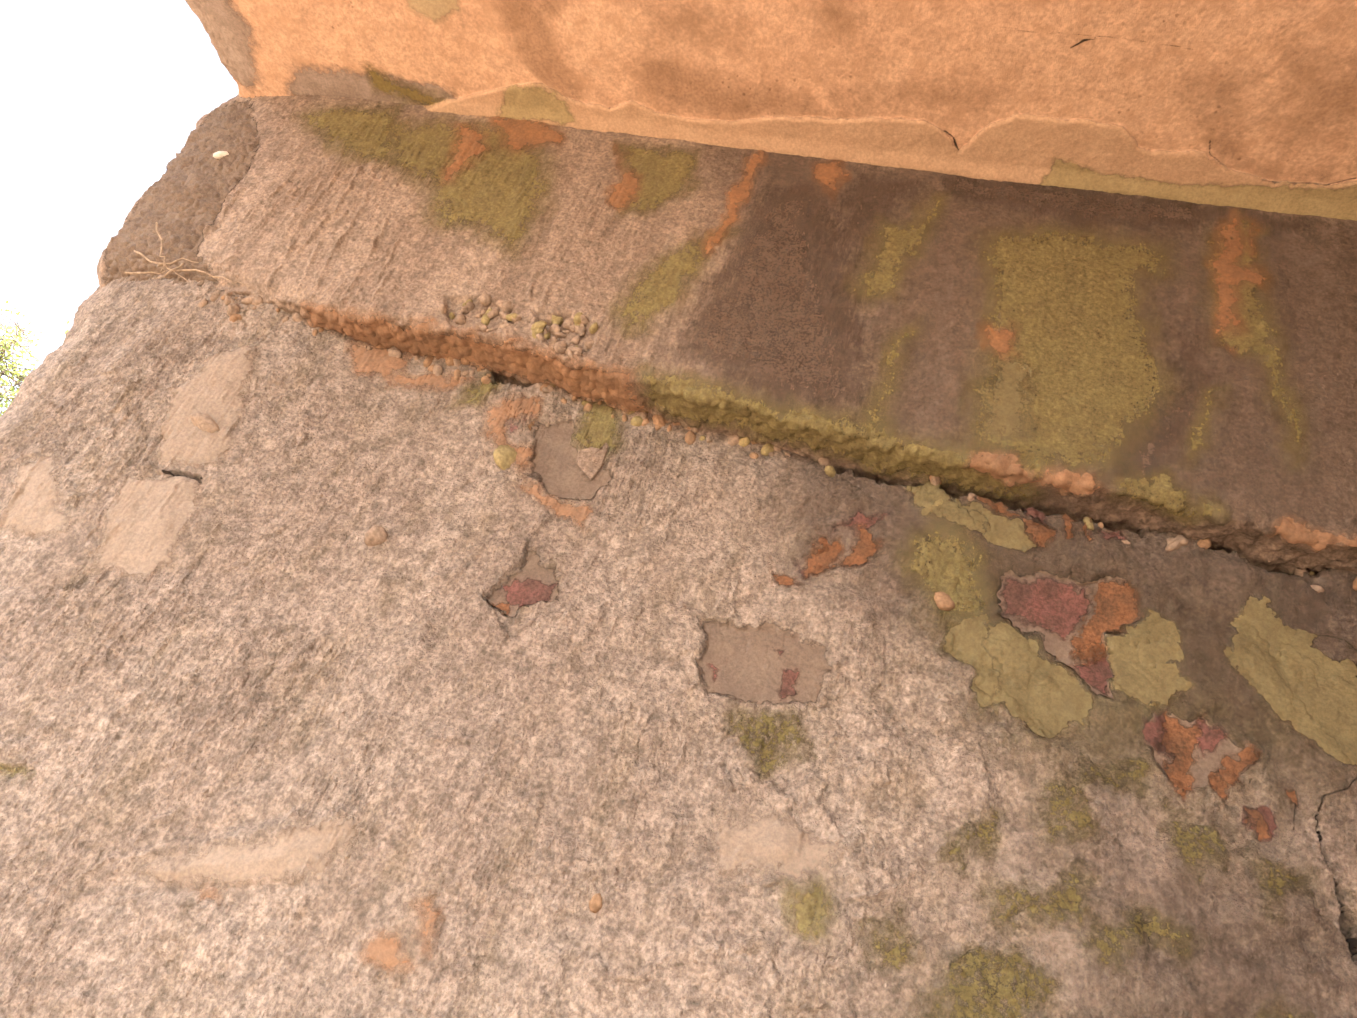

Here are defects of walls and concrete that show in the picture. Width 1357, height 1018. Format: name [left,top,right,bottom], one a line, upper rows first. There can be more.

rust [704,151,766,255]
peeling [424,83,1357,221]
water stain [678,151,1357,533]
rust [1211,210,1269,354]
crack [1293,777,1357,841]
crack [1334,879,1357,957]